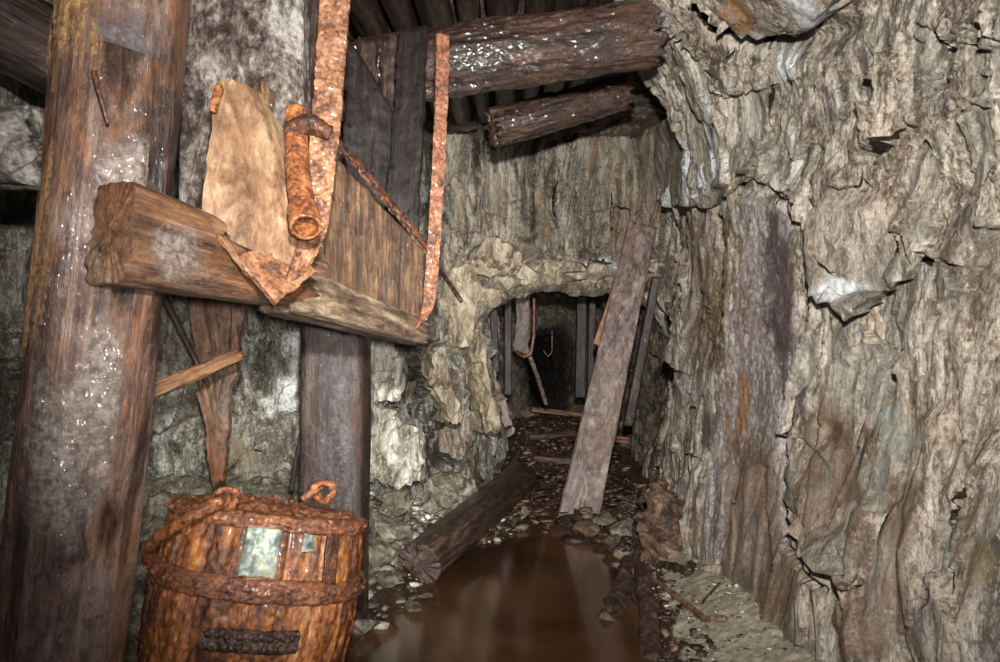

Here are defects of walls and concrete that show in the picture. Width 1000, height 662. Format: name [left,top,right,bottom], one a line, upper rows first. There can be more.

crack [813,255,835,278]
crack [893,235,948,263]
water stain [763,208,795,392]
crack [782,395,797,452]
crack [783,492,798,548]